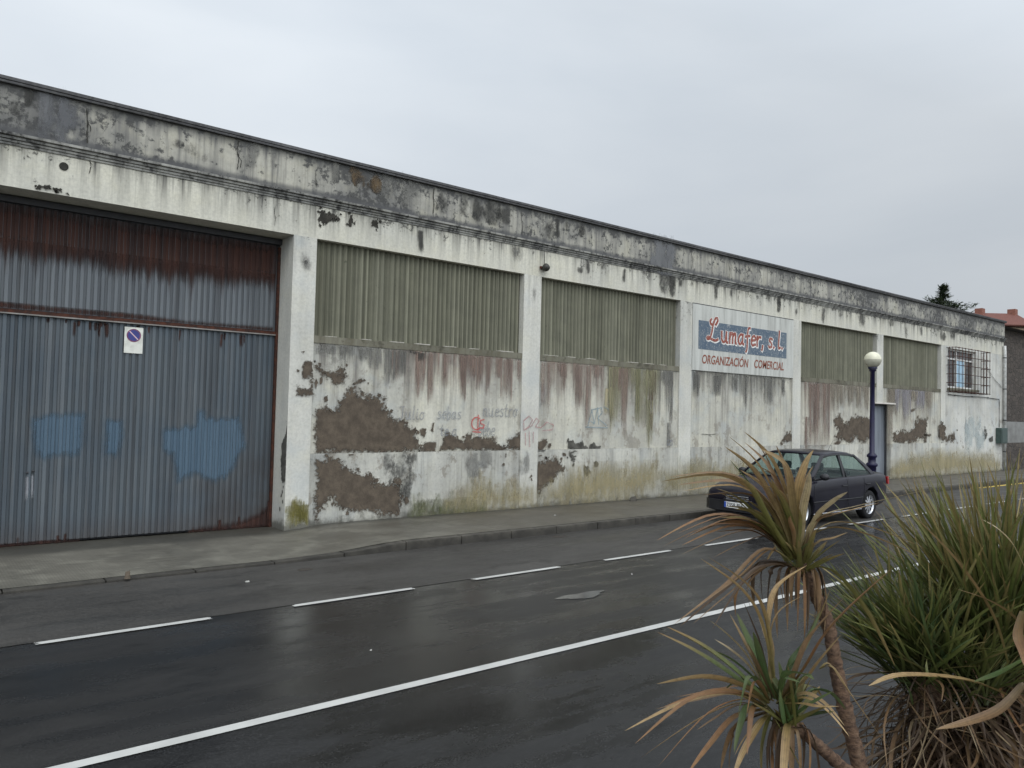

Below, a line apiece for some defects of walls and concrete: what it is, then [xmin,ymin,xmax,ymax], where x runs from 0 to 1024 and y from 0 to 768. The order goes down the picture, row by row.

rust [0,202,277,286]
peeling [296,351,520,521]
water stain [634,370,673,440]
water stain [695,371,785,401]
peeling [833,413,870,445]
peeling [893,408,958,443]
peeling [531,438,601,494]